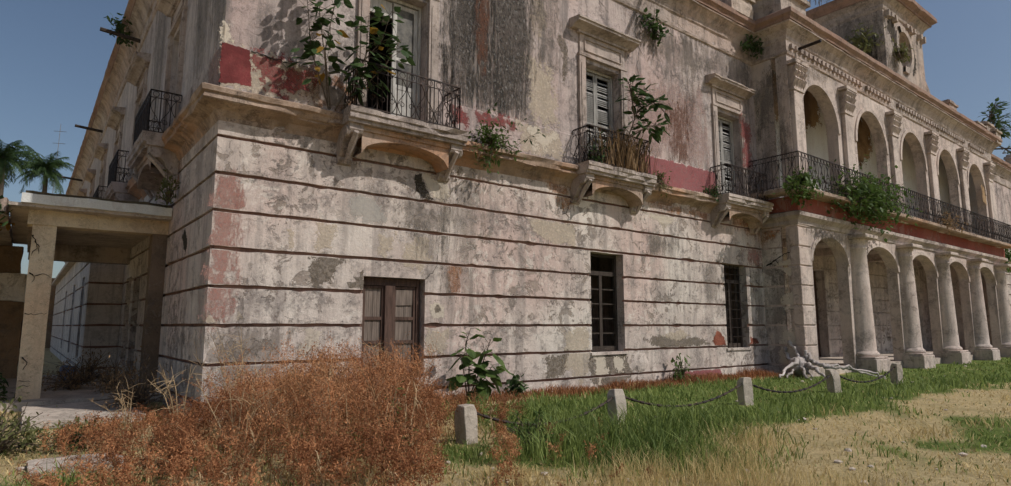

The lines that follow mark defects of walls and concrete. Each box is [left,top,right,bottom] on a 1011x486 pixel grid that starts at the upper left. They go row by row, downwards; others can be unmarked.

peeling [209,5,326,107]
leakage [440,0,563,120]
flaking render [414,173,450,202]
crack [29,235,48,282]
flaking render [303,217,346,288]
flaking render [542,327,632,387]
flaking render [643,328,726,347]